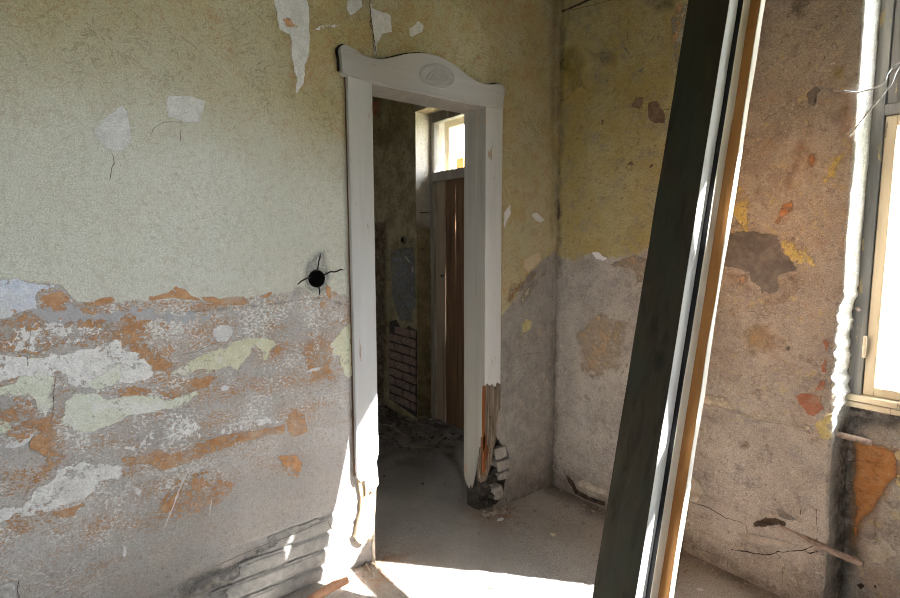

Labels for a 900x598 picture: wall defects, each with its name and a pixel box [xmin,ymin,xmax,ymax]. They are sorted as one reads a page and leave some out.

peeling [274,0,338,93]
peeling [347,0,392,55]
peeling [93,106,132,152]
peeling [166,96,206,123]
spalling [724,187,816,294]
peeling [0,279,307,523]
peeling [302,323,352,383]
spalling [795,339,836,439]
spalling [208,513,338,598]
crack [682,502,818,584]